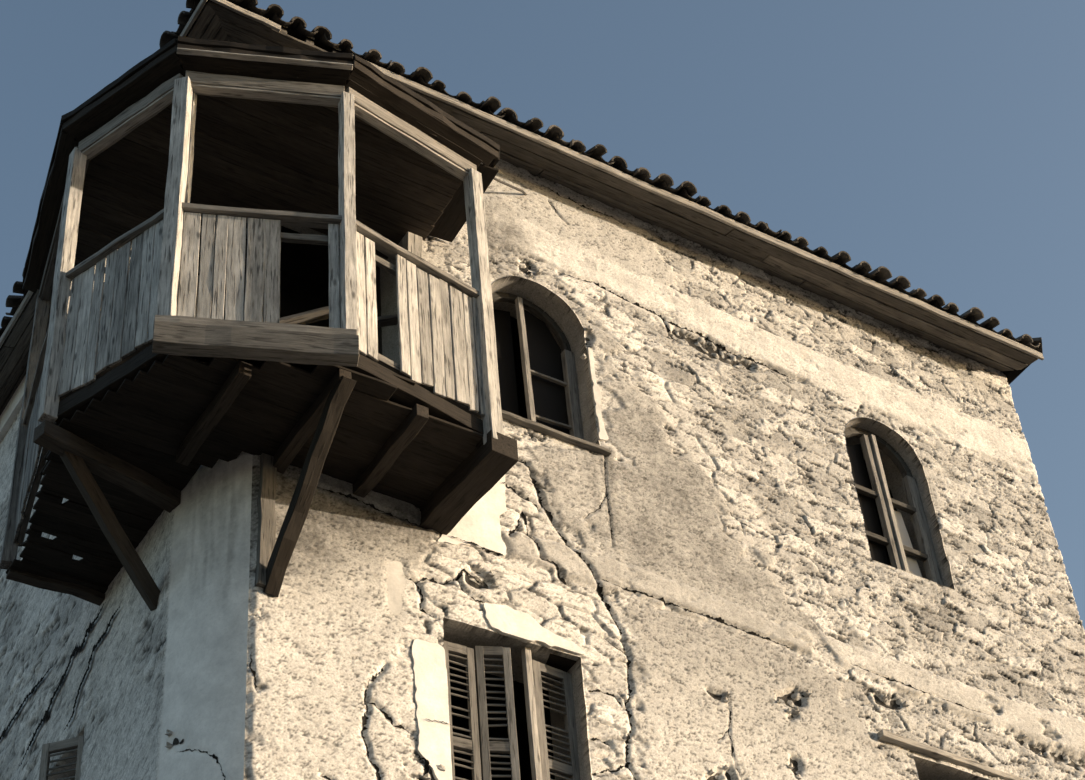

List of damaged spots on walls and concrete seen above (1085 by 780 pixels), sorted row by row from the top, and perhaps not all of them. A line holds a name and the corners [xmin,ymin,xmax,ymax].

crack [318,487,420,527]
crack [407,569,489,617]
crack [451,456,790,780]
crack [361,665,454,780]
crack [180,749,225,780]
spalling [707,765,731,780]